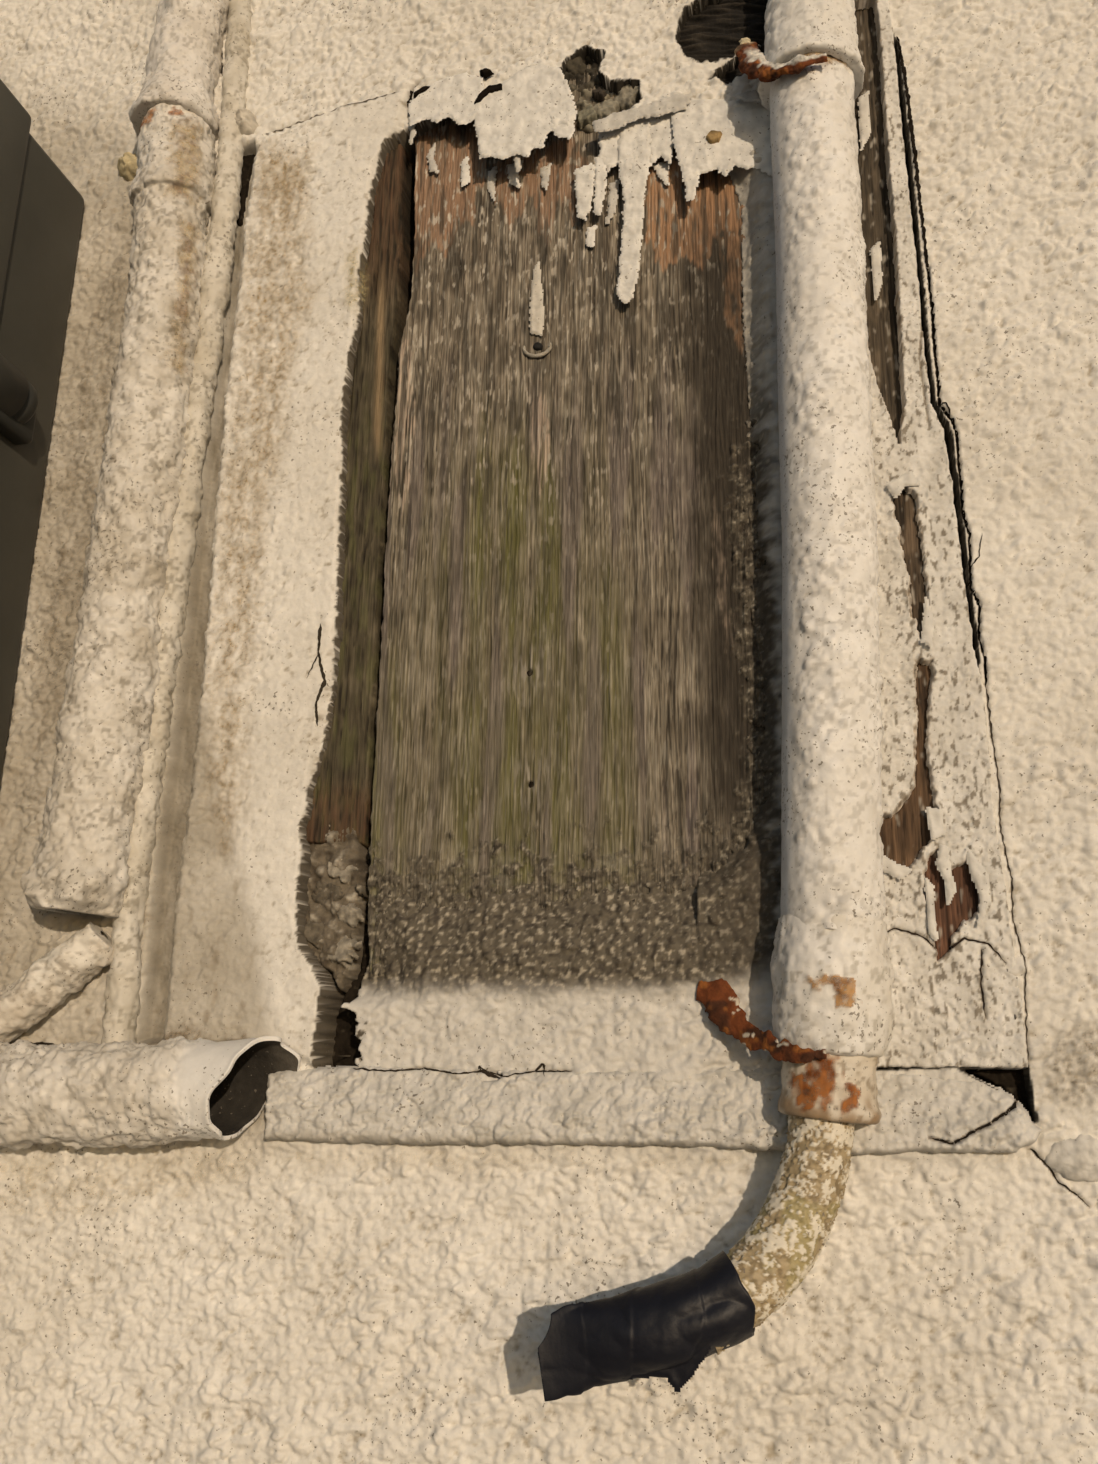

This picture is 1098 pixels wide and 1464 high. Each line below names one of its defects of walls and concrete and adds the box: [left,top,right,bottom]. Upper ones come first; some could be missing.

peeling [408,55,772,304]
peeling [887,471,935,648]
crack [887,36,1088,1206]
spalling [304,825,370,993]
crack [332,841,570,1079]
corrosion [792,1058,860,1112]
corrosion [810,975,856,1007]
peeling [880,663,991,961]